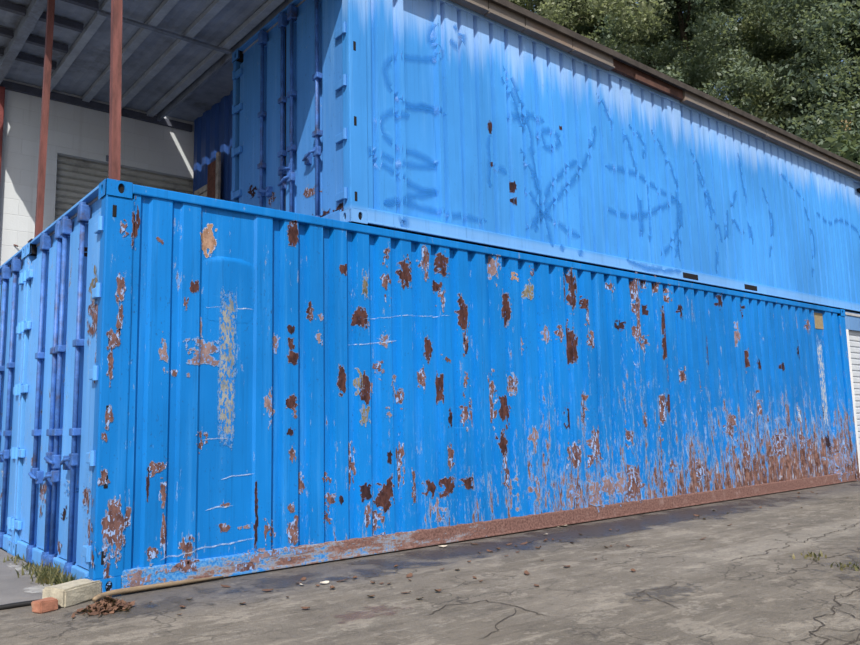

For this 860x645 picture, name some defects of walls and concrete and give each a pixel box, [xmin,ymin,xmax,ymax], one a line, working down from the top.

peeling [200,223,218,258]
rust [78,247,126,387]
peeling [183,289,236,450]
rust [380,243,470,356]
rust [417,335,473,432]
rust [554,267,595,368]
rust [82,466,132,579]
rust [145,458,200,573]
rust [253,393,305,552]
rust [322,433,474,536]
crack [429,600,550,639]
crack [732,523,860,645]